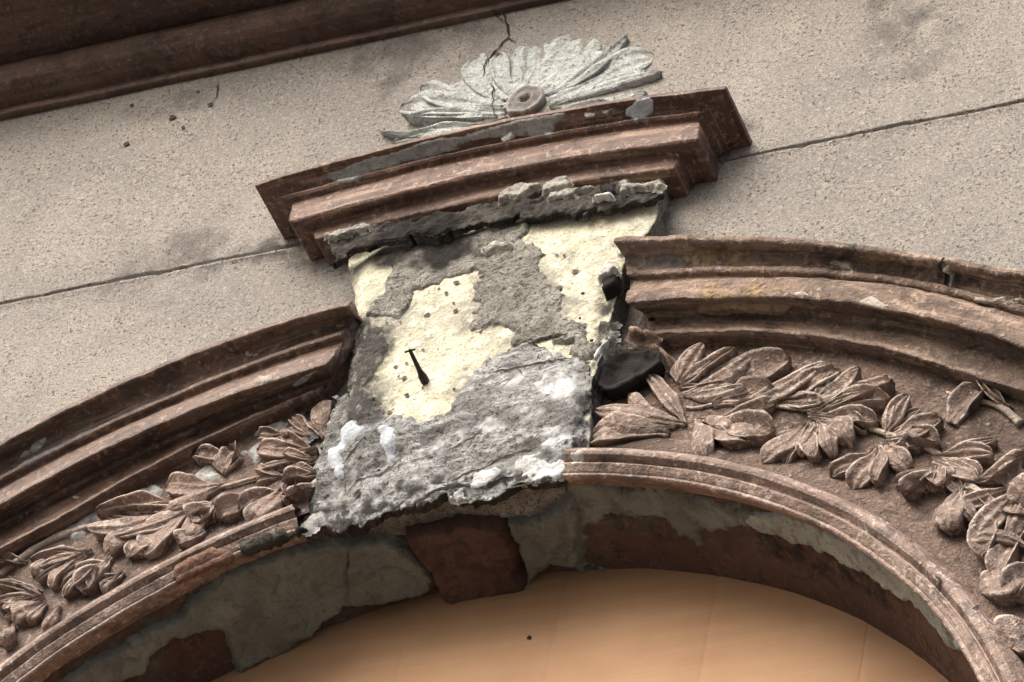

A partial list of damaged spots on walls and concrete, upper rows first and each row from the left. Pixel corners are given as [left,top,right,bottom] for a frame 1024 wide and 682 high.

crack [483,13,515,114]
peeling [625,97,654,121]
peeling [327,113,566,183]
spalling [324,176,667,269]
spalling [589,336,621,373]
water stain [596,297,618,346]
peeling [229,421,319,464]
peeling [327,408,396,481]
water stain [558,380,591,464]
water stain [305,470,553,532]
flaking render [59,448,962,682]